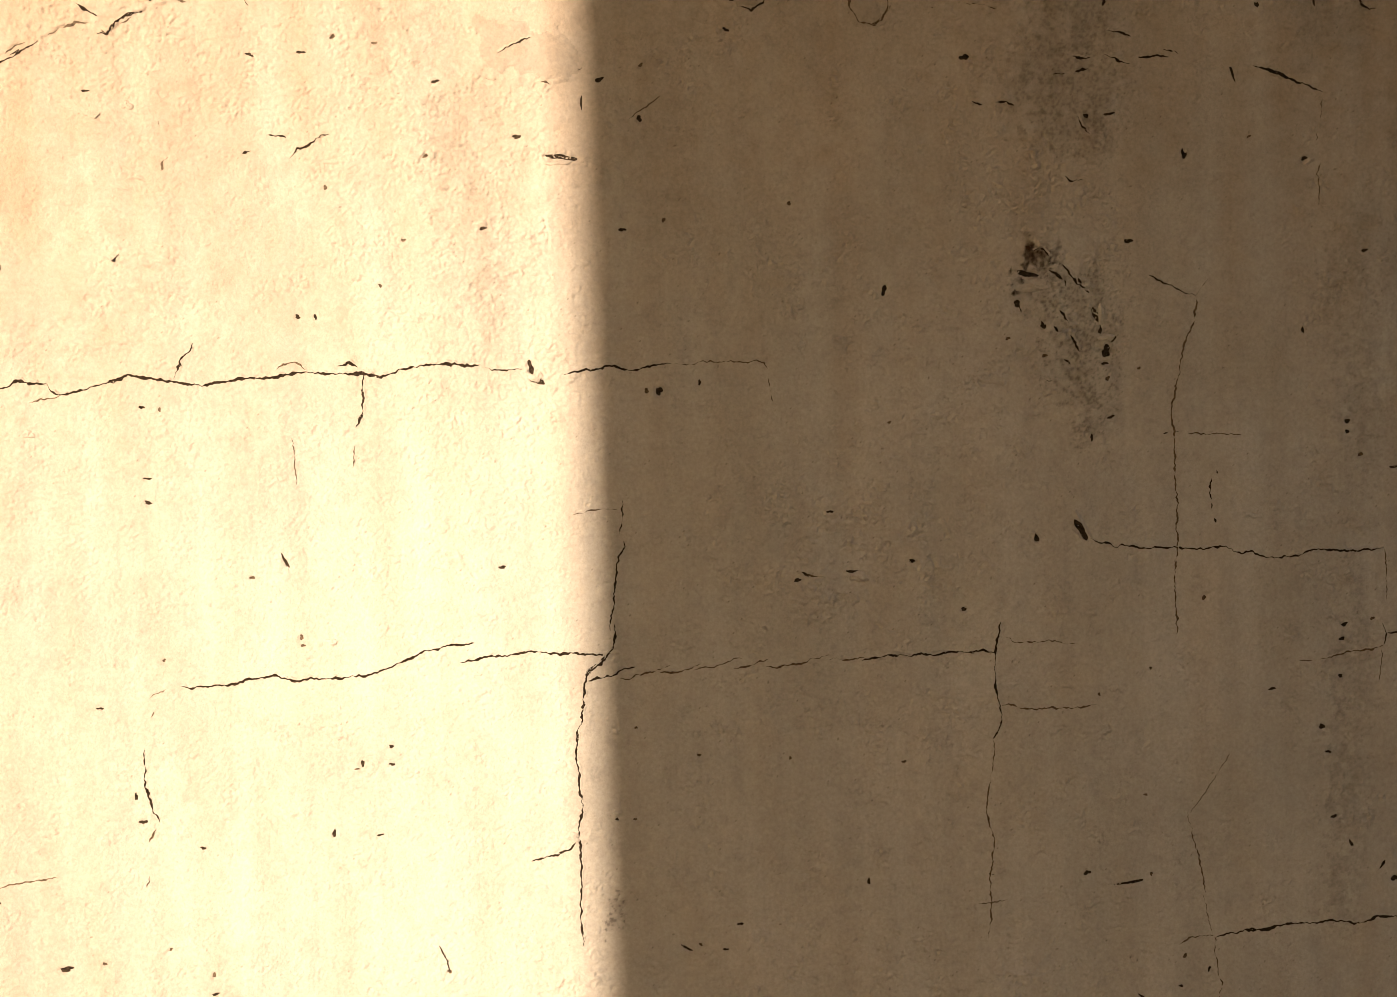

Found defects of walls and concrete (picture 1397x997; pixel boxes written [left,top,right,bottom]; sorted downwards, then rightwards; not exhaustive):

crack [0,343,521,466]
crack [564,360,773,401]
crack [1091,273,1397,679]
crack [143,753,160,842]
crack [151,500,1097,946]
crack [1179,755,1397,997]